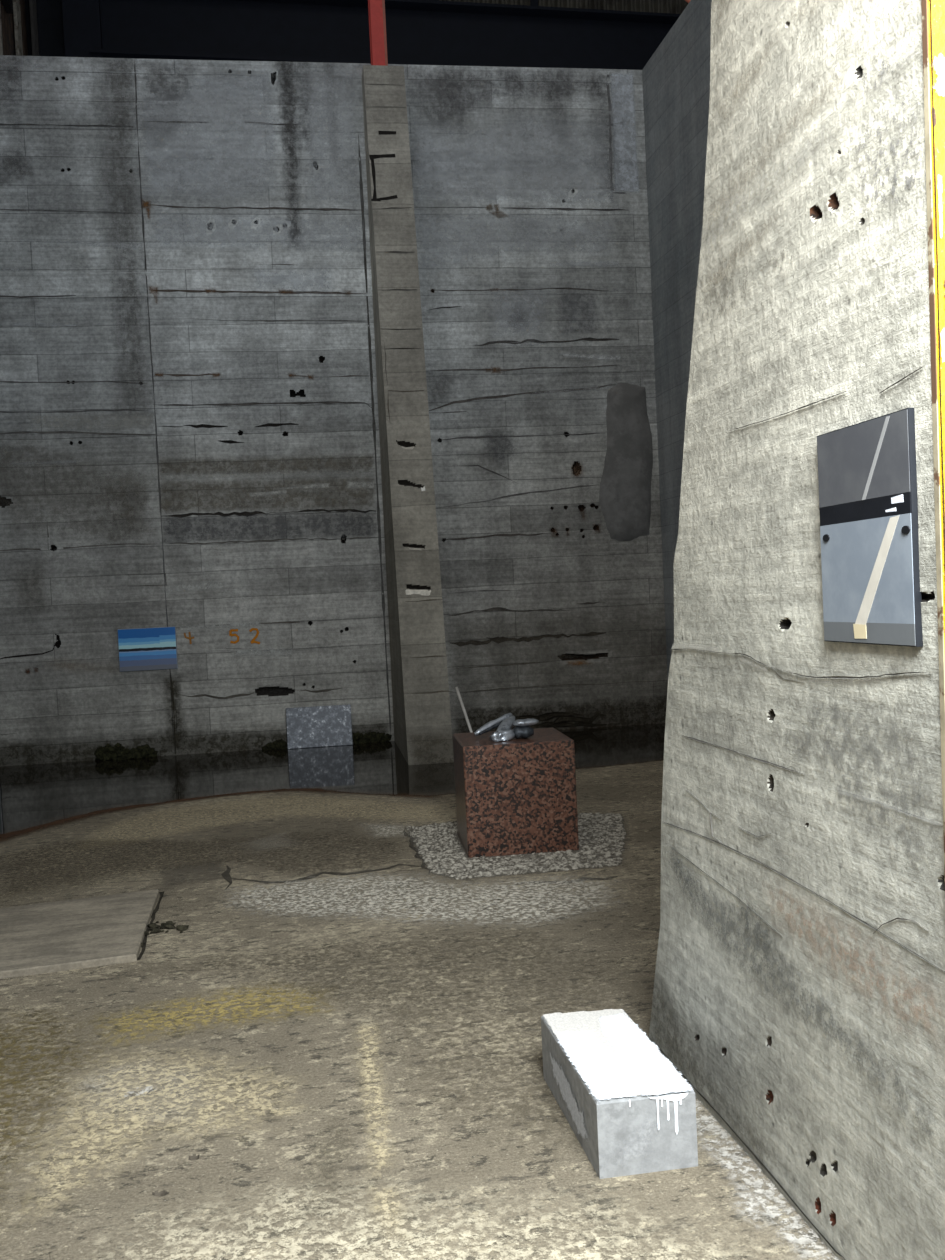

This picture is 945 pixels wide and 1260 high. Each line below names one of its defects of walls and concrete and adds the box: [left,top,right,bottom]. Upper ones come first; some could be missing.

water stain [144,65,297,196]
peeling [932,53,945,126]
crack [880,0,945,571]
corrosion [921,0,945,876]
water stain [0,671,287,766]
crack [682,735,805,775]
crack [672,649,927,682]
crack [664,790,945,972]